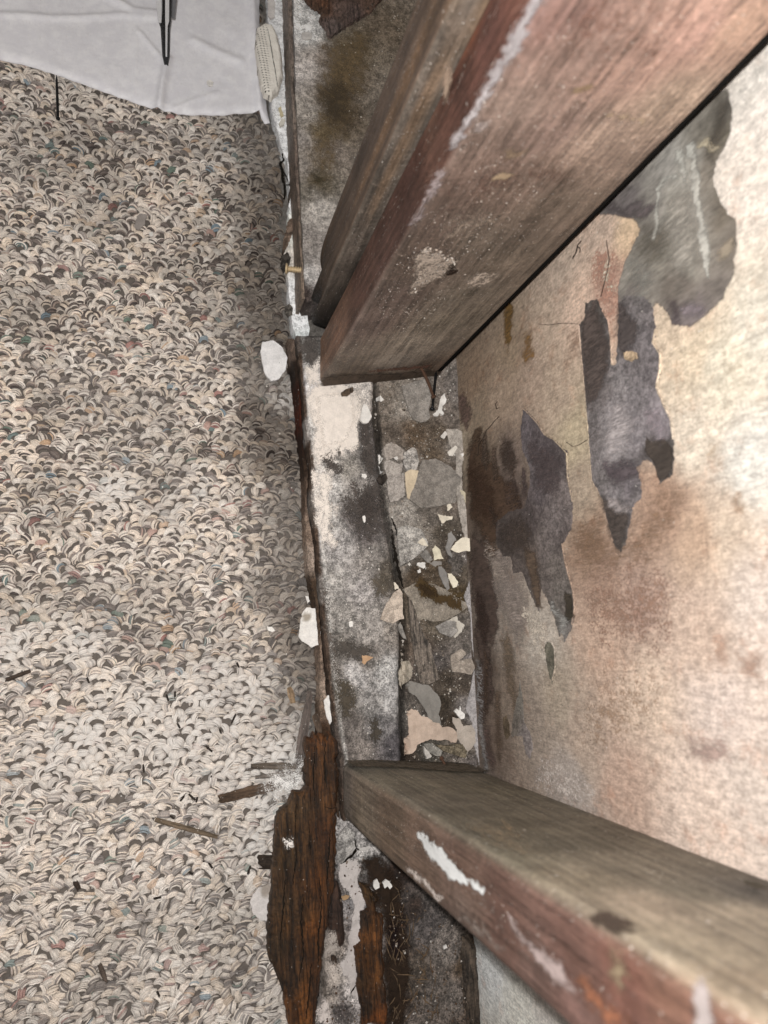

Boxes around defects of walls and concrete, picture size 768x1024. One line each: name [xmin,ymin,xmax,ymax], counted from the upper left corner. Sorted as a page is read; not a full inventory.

water stain [310,30,372,181]
peeling [401,379,447,423]
water stain [320,446,344,477]
peeling [361,442,418,499]
peeling [380,504,470,640]
water stain [339,392,556,773]
water stain [321,580,372,717]
peeling [398,661,441,725]
peeling [450,649,475,675]
peeling [336,826,370,864]